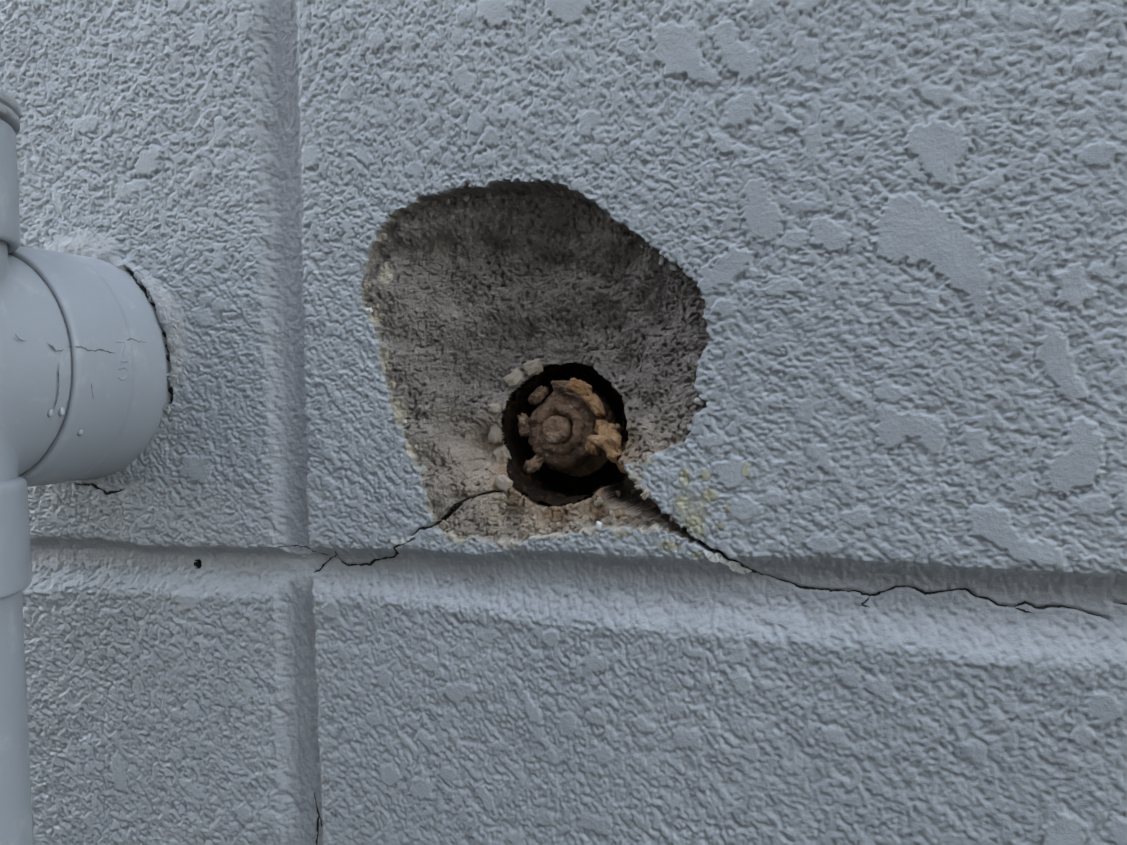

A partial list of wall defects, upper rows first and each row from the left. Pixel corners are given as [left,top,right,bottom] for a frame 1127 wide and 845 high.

spalling [360,179,752,574]
crack [268,490,503,573]
rust [513,486,626,520]
crack [603,475,1127,618]